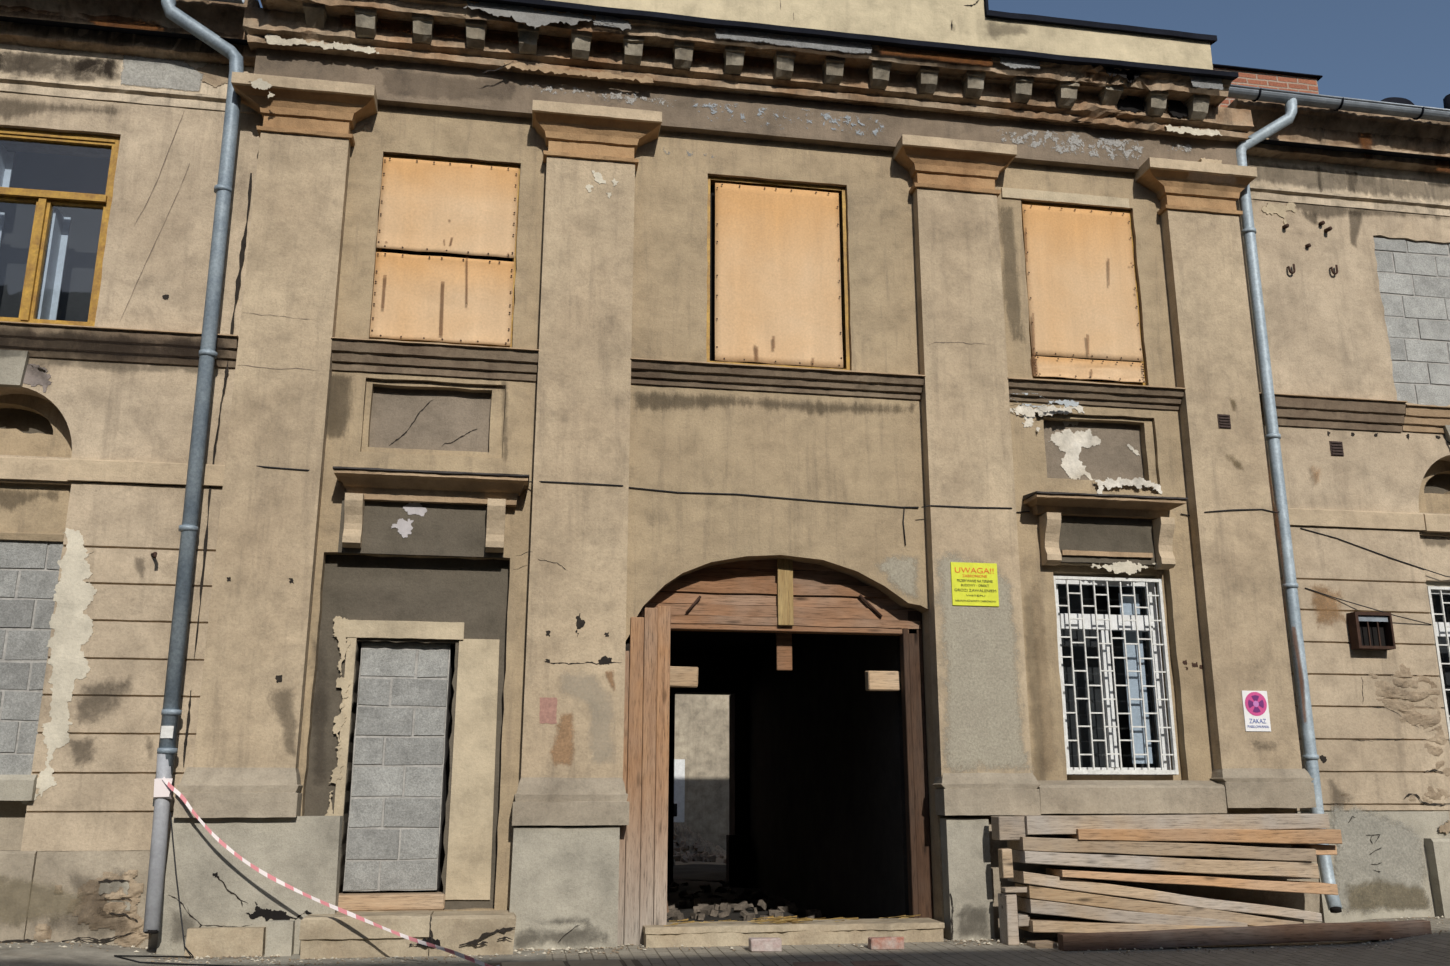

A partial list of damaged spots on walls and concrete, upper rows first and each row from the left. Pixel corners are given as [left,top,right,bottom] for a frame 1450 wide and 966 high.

flaking render [502,62,676,107]
peeling [692,103,884,137]
peeling [996,127,1144,160]
crack [389,400,432,446]
flaking render [1009,391,1163,494]
peeling [391,502,427,538]
flaking render [1090,560,1157,575]
flaking render [325,616,350,816]
flaking render [1368,663,1450,835]
flaking render [54,870,152,947]